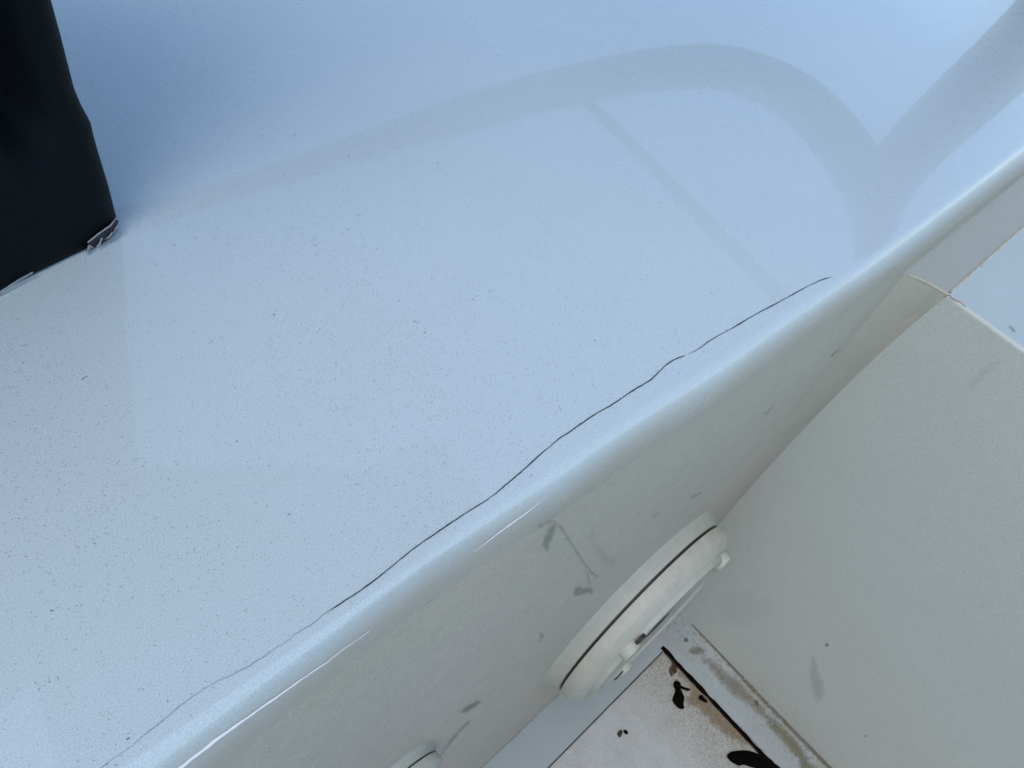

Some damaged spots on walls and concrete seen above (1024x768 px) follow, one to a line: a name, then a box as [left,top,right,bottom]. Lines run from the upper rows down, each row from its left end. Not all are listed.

crack [101,277,830,768]